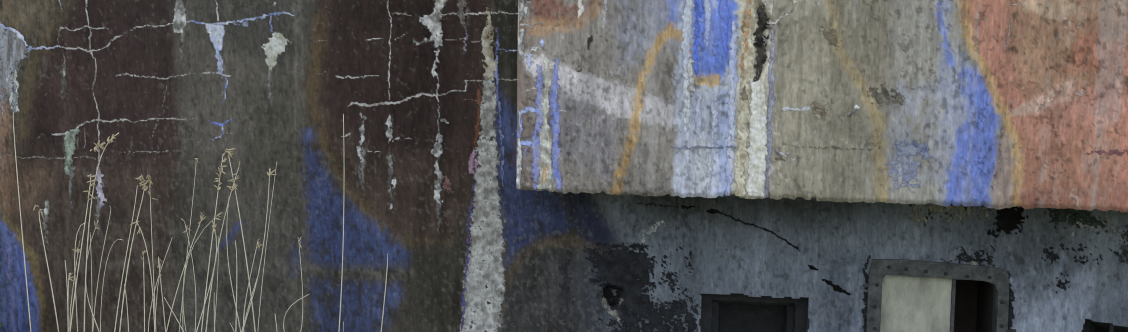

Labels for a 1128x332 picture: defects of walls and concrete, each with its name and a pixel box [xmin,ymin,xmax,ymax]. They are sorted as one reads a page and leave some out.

peeling [0,21,30,118]
crack [8,0,296,160]
crack [336,0,543,114]
water stain [413,0,471,77]
spalling [518,0,541,60]
crack [673,0,882,198]
water stain [431,115,451,226]
water stain [1041,208,1128,299]